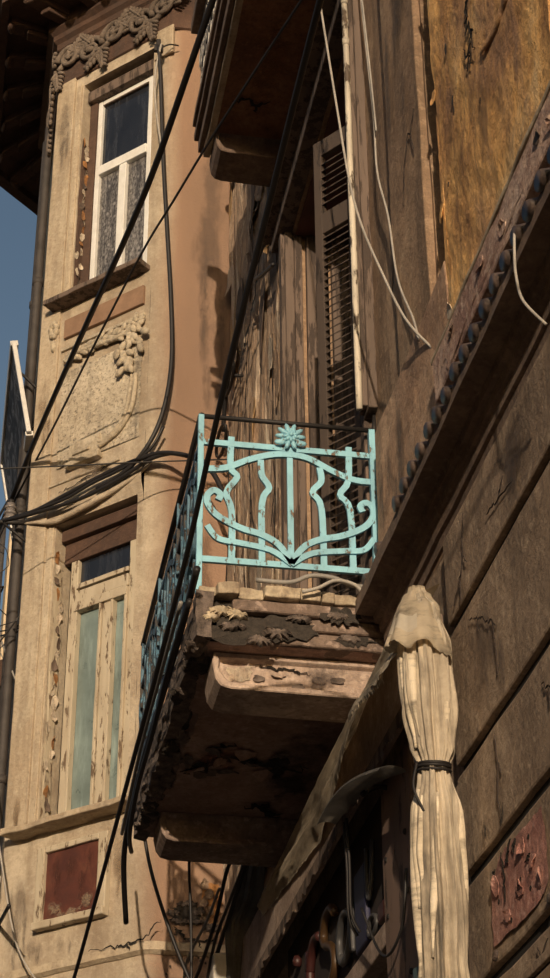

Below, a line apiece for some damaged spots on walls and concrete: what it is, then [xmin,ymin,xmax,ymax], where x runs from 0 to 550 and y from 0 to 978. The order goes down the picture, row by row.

crack [463,0,476,71]
peeling [73,138,90,287]
flaking render [224,182,282,591]
crack [486,476,511,515]
crack [453,513,499,674]
peeling [40,551,64,819]
spalling [133,589,377,842]
crack [89,922,214,951]